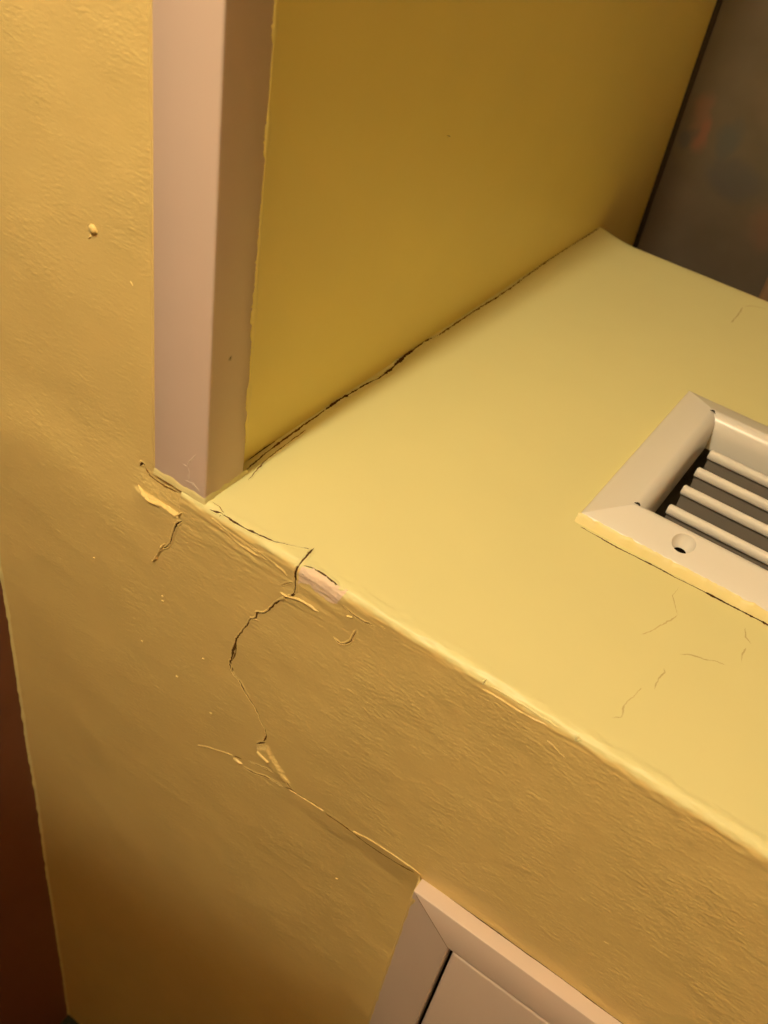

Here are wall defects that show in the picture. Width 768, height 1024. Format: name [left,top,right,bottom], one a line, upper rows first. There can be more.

crack [243,228,599,480]
spalling [138,460,183,517]
crack [151,519,183,561]
crack [209,502,315,745]
peeling [276,592,319,612]
spalling [298,563,385,628]
crack [333,615,358,646]
crack [581,527,768,718]
crack [285,787,421,875]